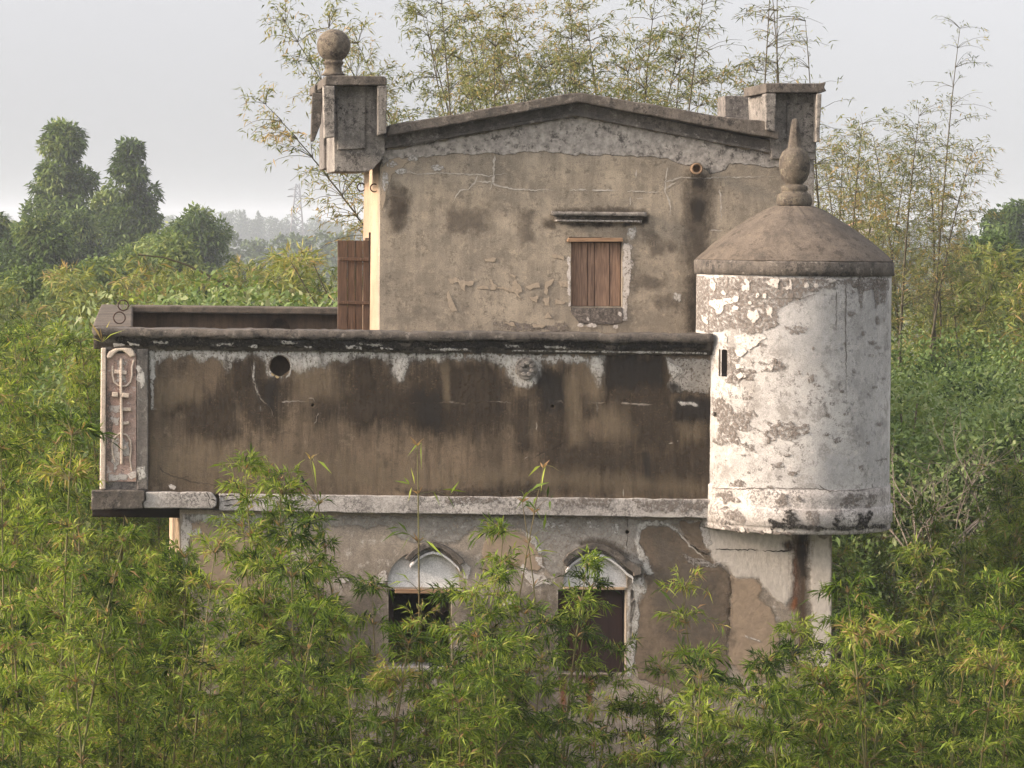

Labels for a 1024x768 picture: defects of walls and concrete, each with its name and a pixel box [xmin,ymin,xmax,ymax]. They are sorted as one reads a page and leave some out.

flaking render [382,116,779,174]
crack [399,156,774,231]
damp [115,175,746,525]
flaking render [447,227,636,332]
peeling [696,276,890,384]
crack [755,283,847,396]
spalling [666,357,810,476]
damp [768,493,887,532]
flaking render [181,514,831,697]
rust [782,535,809,648]